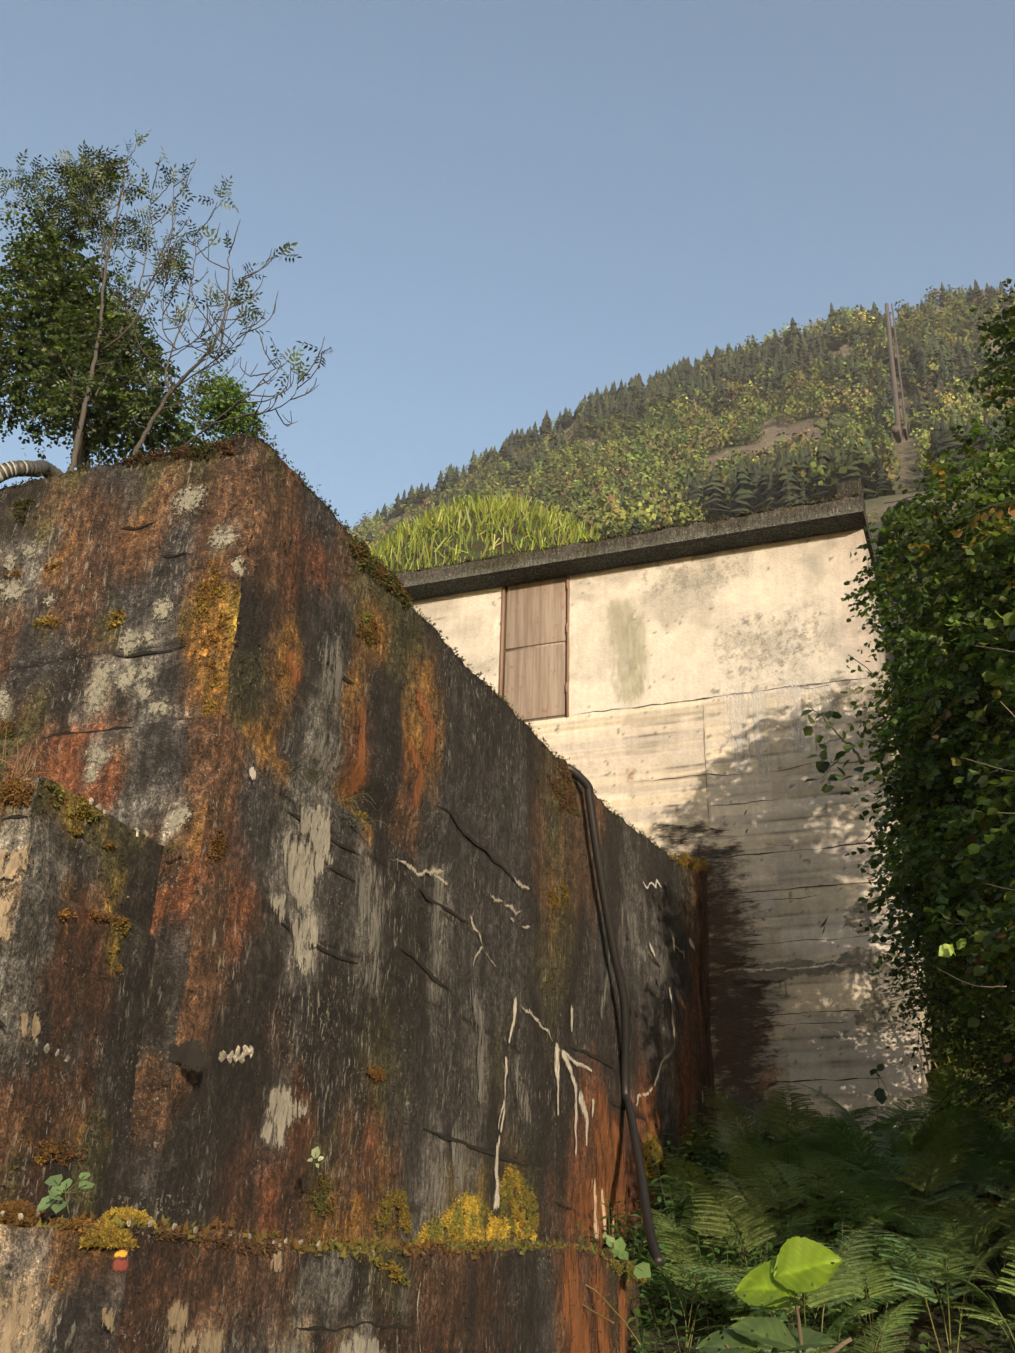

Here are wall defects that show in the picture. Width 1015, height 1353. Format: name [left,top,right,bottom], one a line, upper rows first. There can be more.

peeling [0,843,31,941]
peeling [269,804,333,976]
peeling [352,866,385,996]
water stain [470,986,487,1105]
water stain [493,997,531,1210]
water stain [554,1043,595,1153]
water stain [600,958,612,1020]
water stain [636,987,676,1106]
water stain [673,852,919,1130]
water stain [427,1123,466,1228]
water stain [590,1179,614,1240]